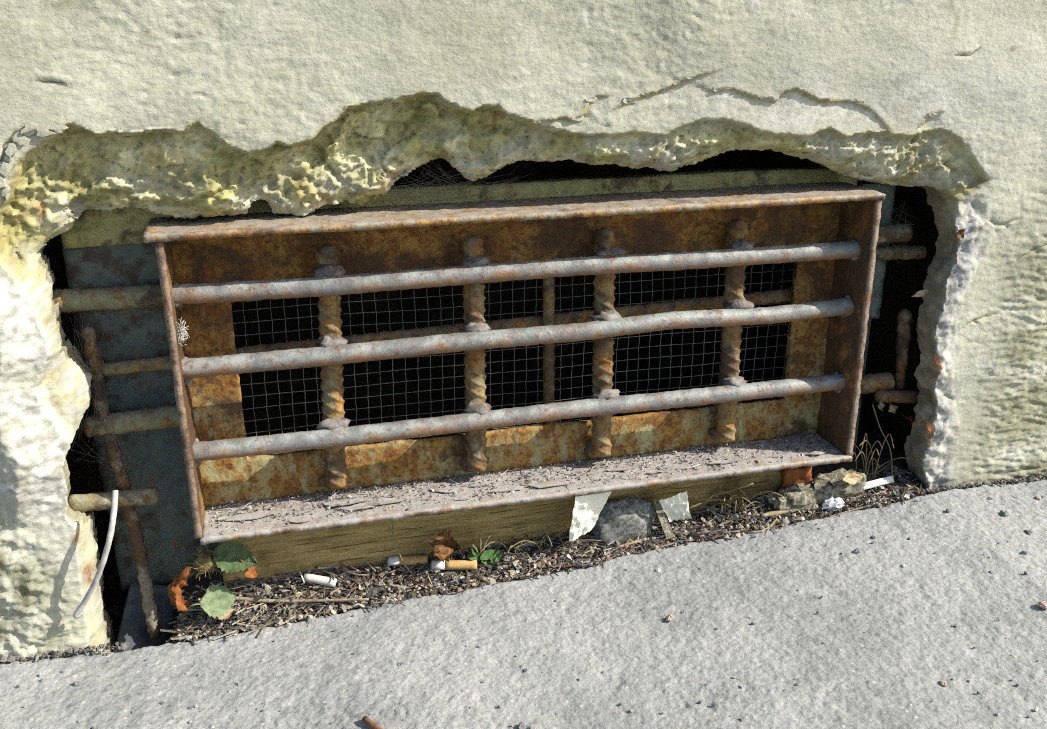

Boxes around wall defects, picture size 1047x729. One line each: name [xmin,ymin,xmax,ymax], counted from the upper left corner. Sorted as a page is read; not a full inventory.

flaking render [0,72,989,332]
flaking render [74,510,116,654]
peeling [218,510,277,521]
peeling [322,498,407,511]